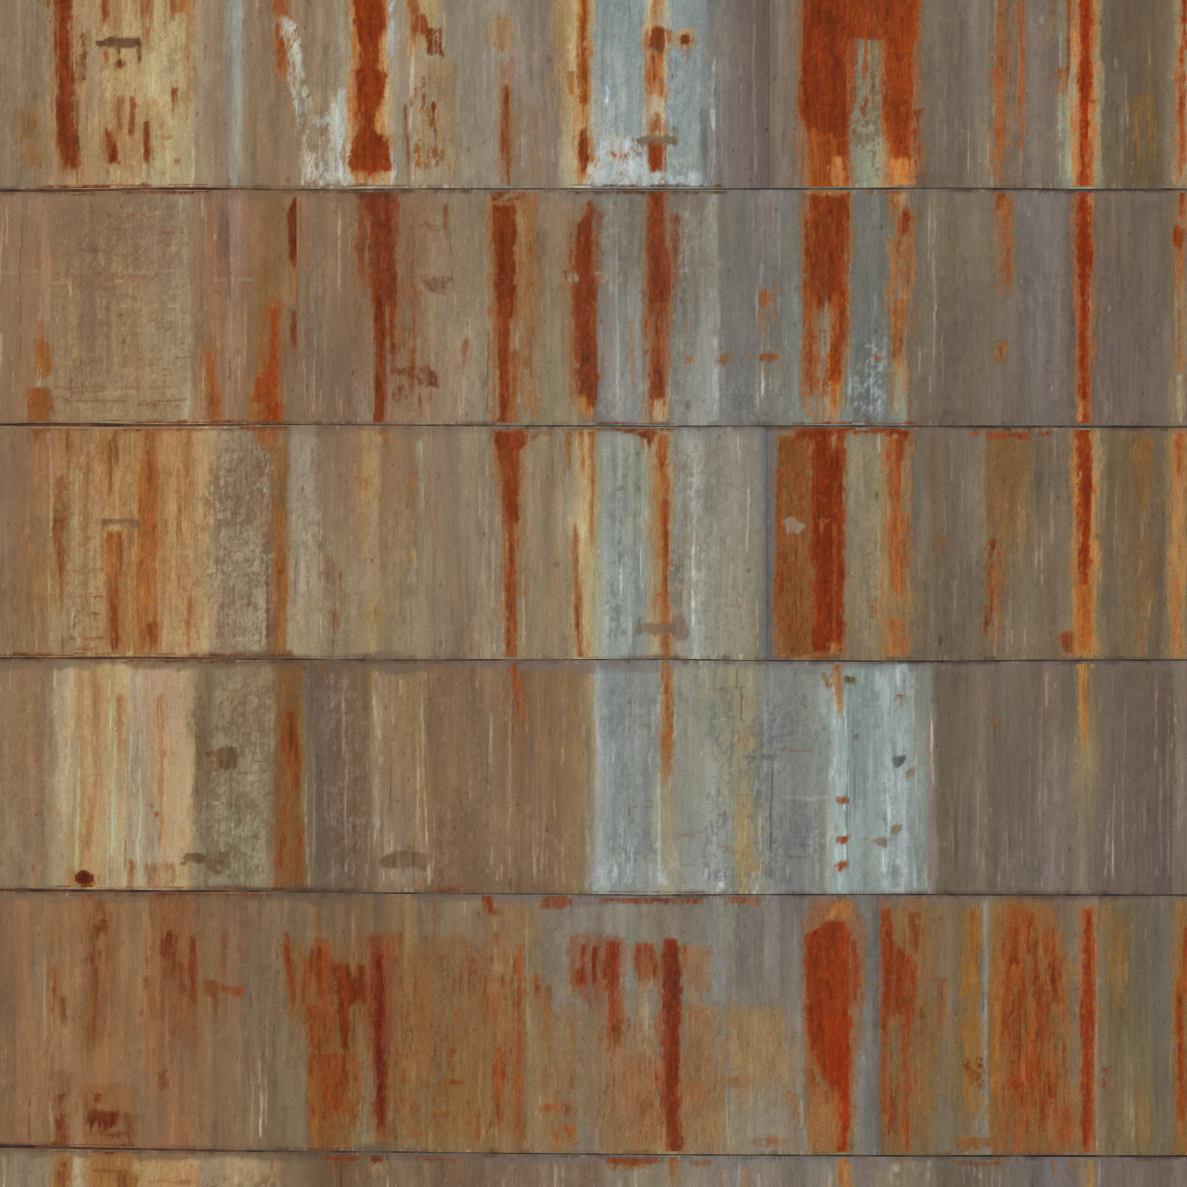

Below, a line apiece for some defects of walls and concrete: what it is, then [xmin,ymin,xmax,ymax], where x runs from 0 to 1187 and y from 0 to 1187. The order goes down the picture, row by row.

corrosion [10,0,210,197]
corrosion [0,195,385,1187]
corrosion [341,0,460,524]
corrosion [479,0,733,794]
corrosion [275,885,1187,1187]
corrosion [720,277,783,416]
corrosion [769,0,930,719]
corrosion [965,0,1107,753]